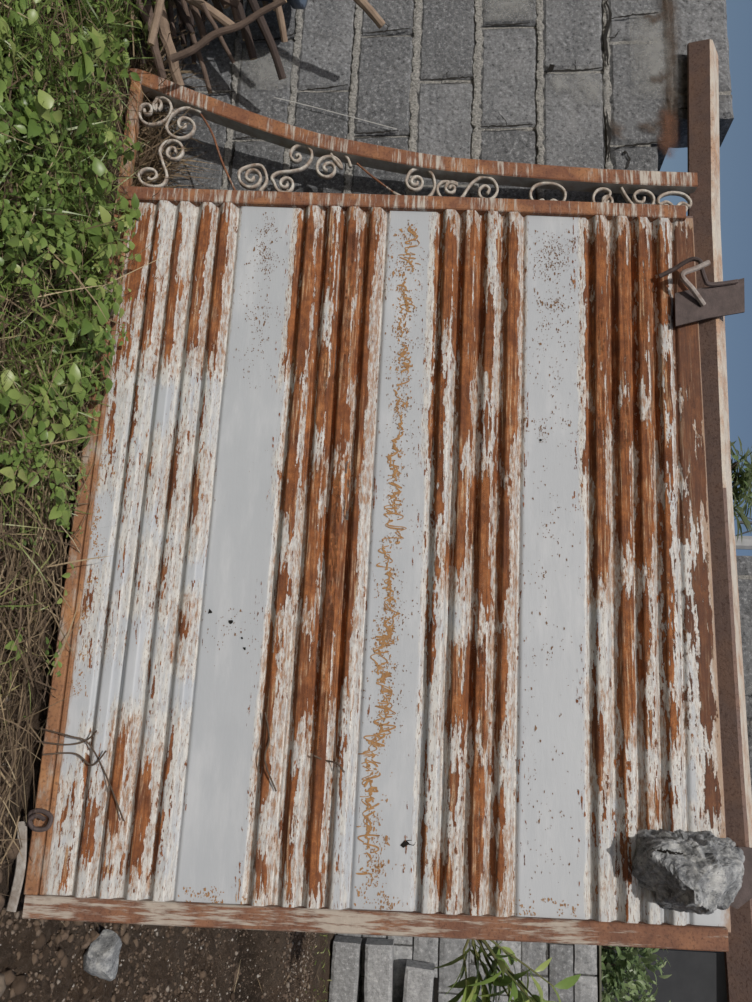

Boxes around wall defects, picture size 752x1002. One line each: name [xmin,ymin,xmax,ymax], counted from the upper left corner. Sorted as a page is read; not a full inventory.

rust [57,200,242,894]
peeling [354,811,408,910]
rust [235,205,529,916]
peeling [362,568,422,754]
peeling [376,222,432,518]
rust [568,214,725,923]